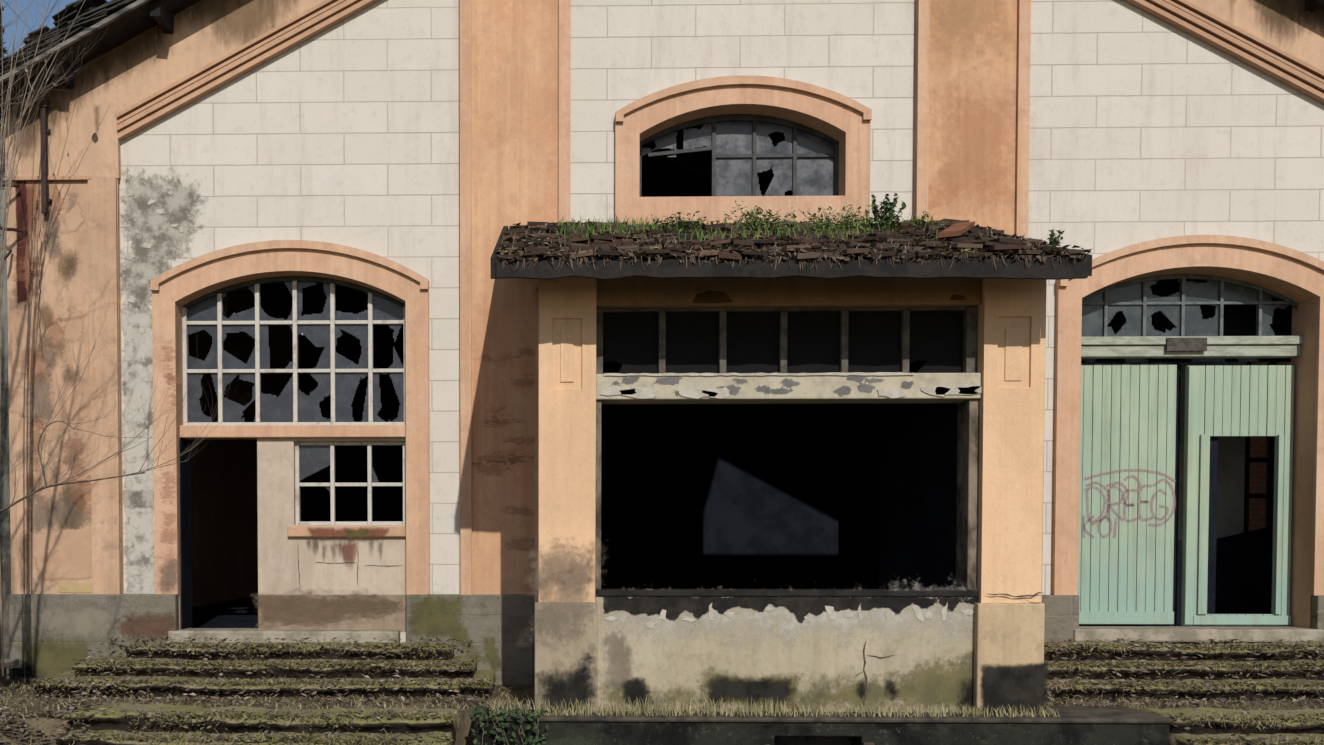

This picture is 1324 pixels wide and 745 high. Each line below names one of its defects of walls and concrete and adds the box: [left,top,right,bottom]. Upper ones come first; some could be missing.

leakage [1262,0,1324,31]
rust [15,181,35,303]
peeling [120,168,204,594]
peeling [600,372,982,399]
flaking render [33,525,92,581]
flaking render [29,602,174,641]
flaking render [603,596,979,646]
leakage [537,655,724,713]
spalling [704,673,797,705]
crack [854,642,896,705]
leakage [748,652,1048,714]